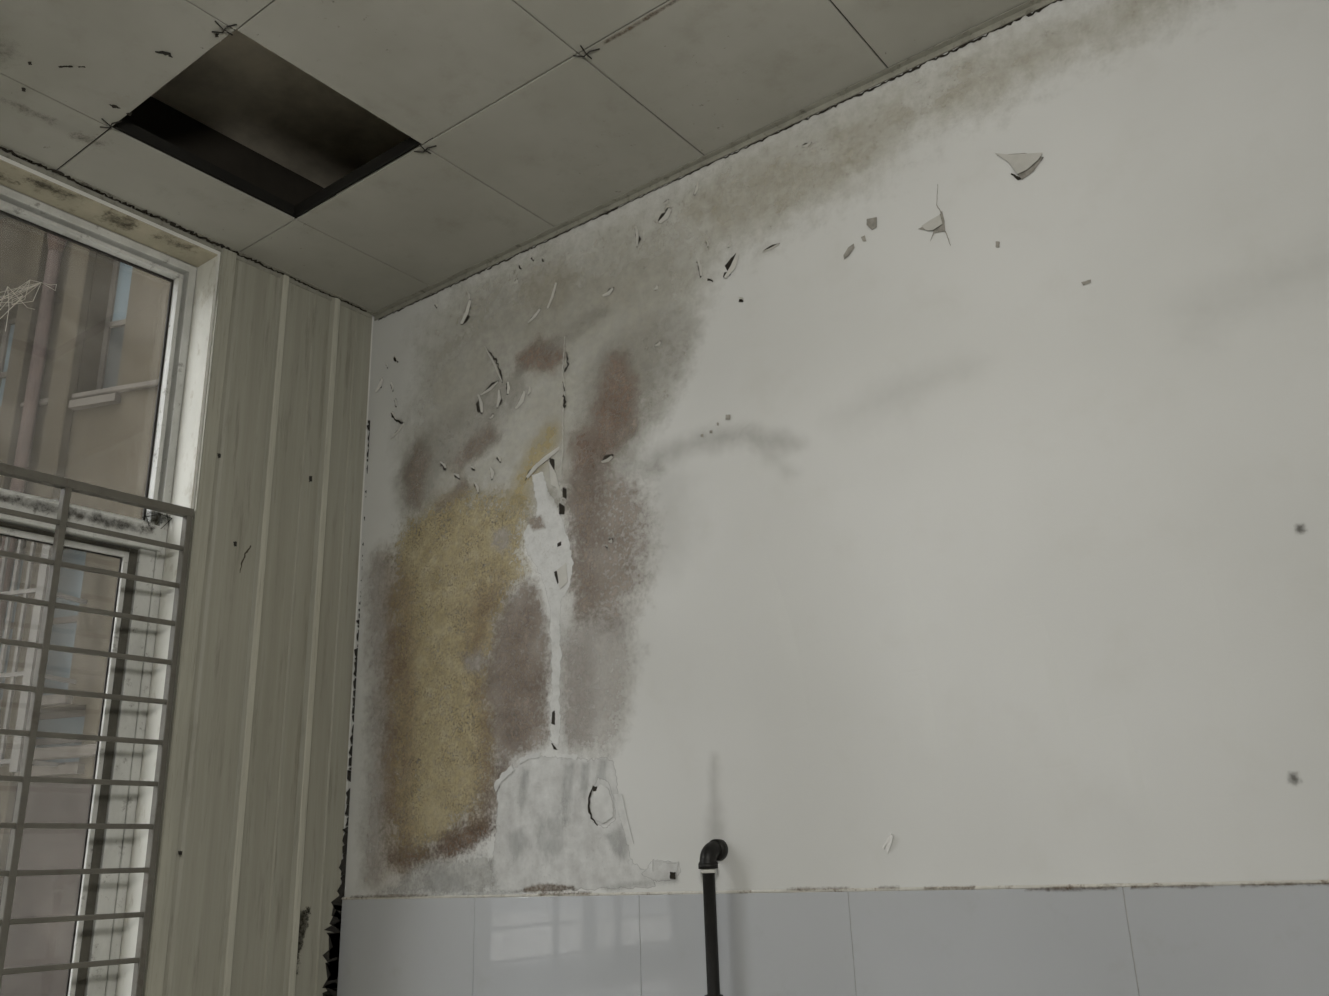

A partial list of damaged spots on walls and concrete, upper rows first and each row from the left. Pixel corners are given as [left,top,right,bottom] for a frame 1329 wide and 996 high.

spalling [995,153,1043,180]
spalling [843,217,877,259]
spalling [919,184,951,246]
peeling [476,346,531,419]
peeling [491,446,655,893]